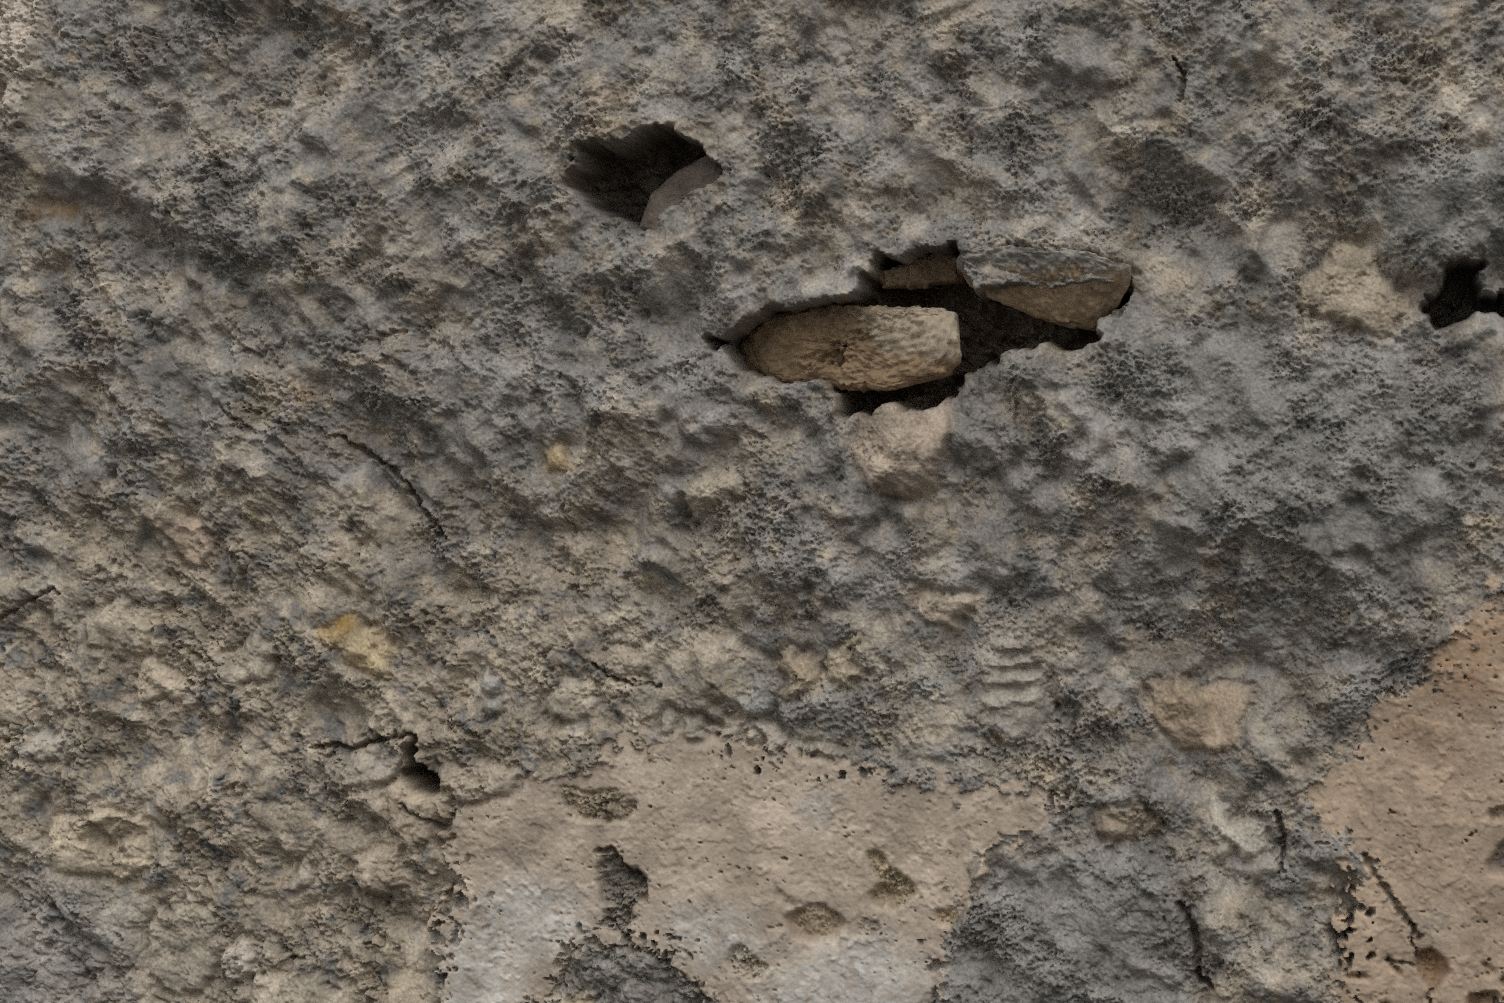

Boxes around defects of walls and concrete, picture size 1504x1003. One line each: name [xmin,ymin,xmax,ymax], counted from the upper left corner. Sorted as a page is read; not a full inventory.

crack [328,434,445,536]
crack [309,730,414,752]